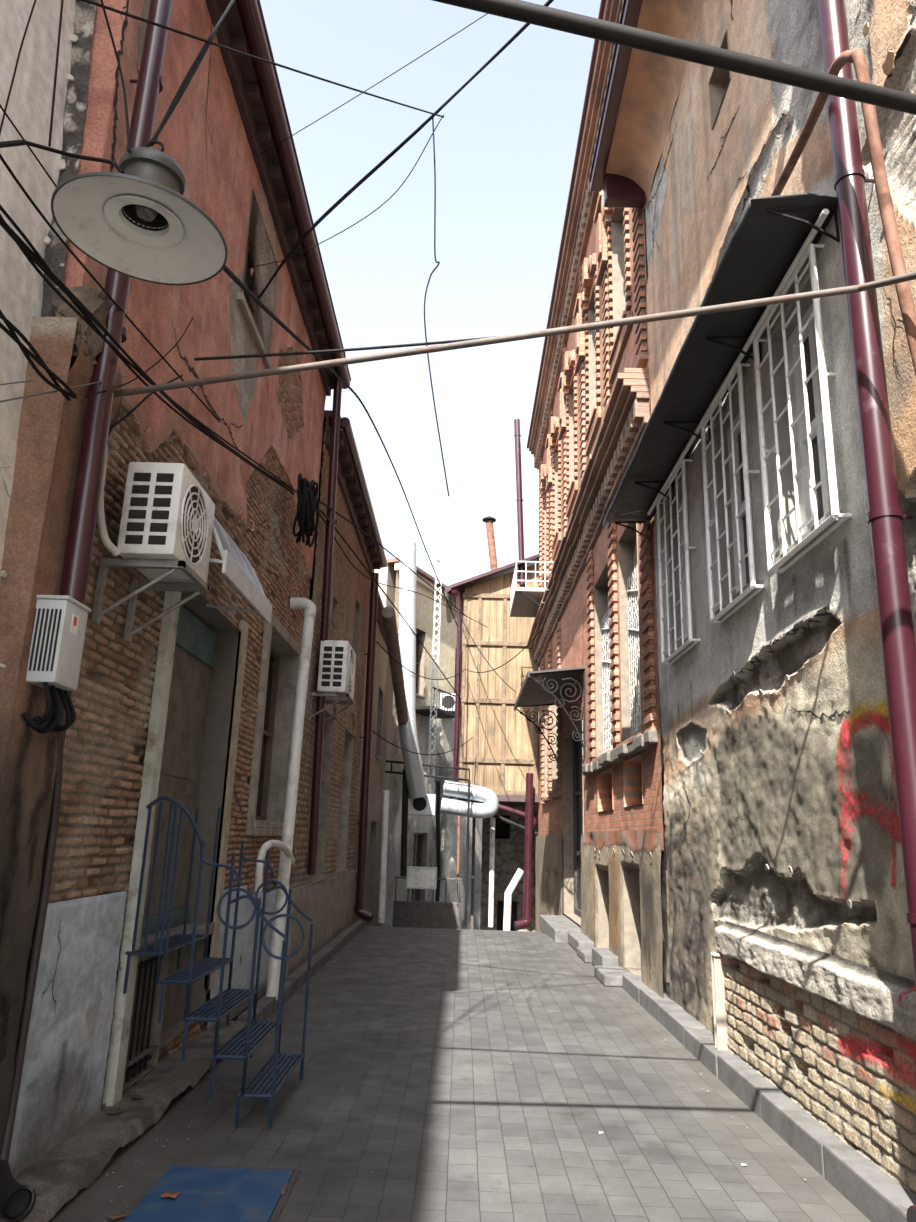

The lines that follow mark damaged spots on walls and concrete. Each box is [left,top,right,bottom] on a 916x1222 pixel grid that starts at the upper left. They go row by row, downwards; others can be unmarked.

peeling [765,0,824,73]
spalling [844,0,916,95]
peeling [714,81,829,272]
spalling [855,101,916,230]
spalling [898,467,916,646]
spalling [708,606,845,715]
spalling [709,852,878,934]